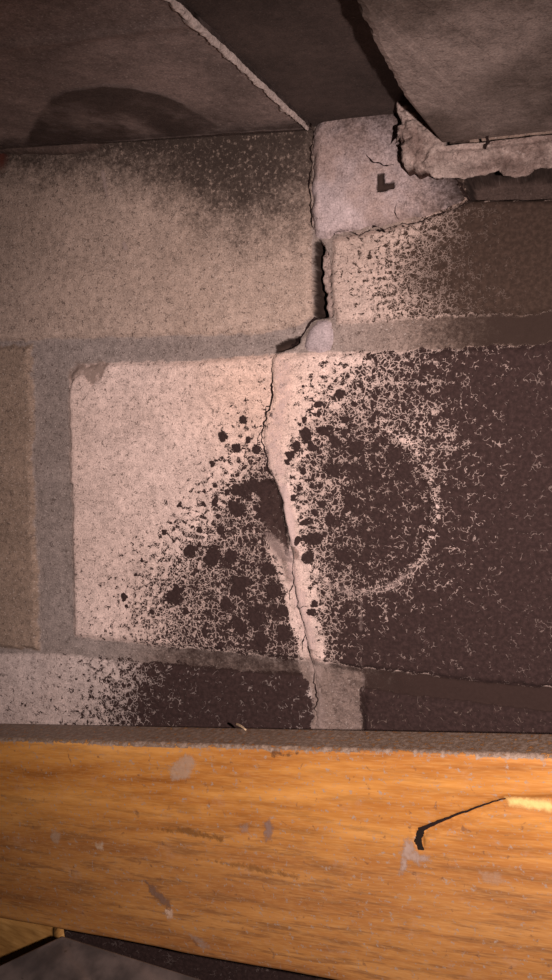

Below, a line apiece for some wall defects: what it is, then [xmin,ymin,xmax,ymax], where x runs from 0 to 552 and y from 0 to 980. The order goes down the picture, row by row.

damp [27,87,302,147]
damp [0,178,552,734]
crack [256,317,319,725]
damp [64,929,316,980]